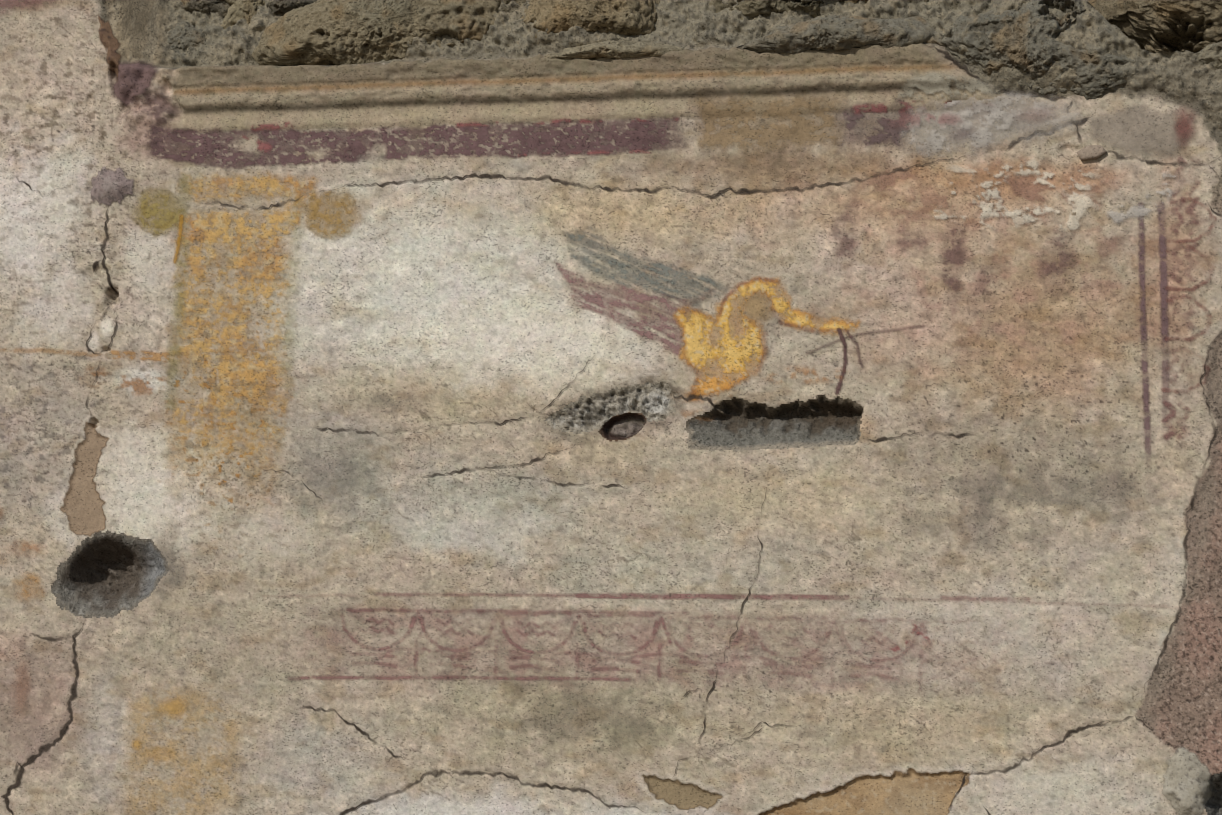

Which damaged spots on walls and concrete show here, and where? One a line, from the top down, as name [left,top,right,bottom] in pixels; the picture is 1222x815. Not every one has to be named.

crack [347,173,862,198]
crack [890,158,958,173]
crack [85,209,118,408]
spalling [544,381,677,434]
spalling [60,422,109,536]
crack [730,538,763,640]
crack [1,628,82,815]
crack [301,706,639,815]
spalling [643,775,723,810]
crack [673,675,717,777]
crack [743,722,800,739]
spalling [759,768,970,815]